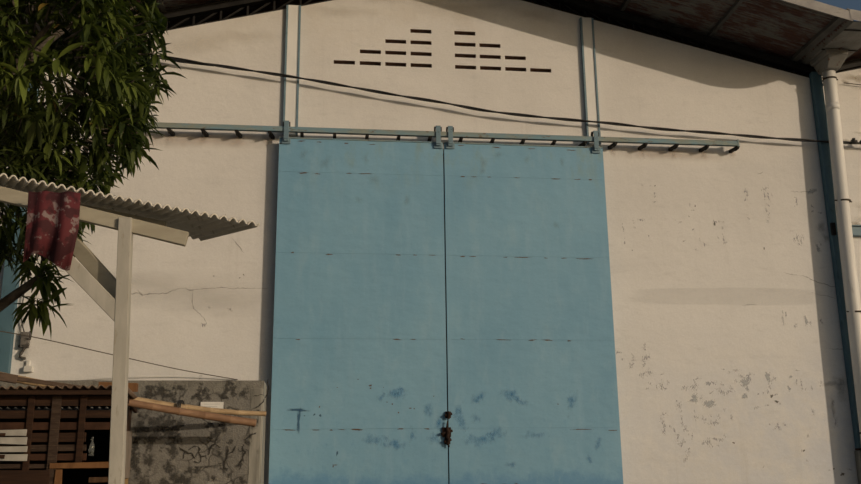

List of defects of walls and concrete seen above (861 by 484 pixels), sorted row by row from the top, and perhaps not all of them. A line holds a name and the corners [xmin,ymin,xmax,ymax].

crack [179,433,256,471]